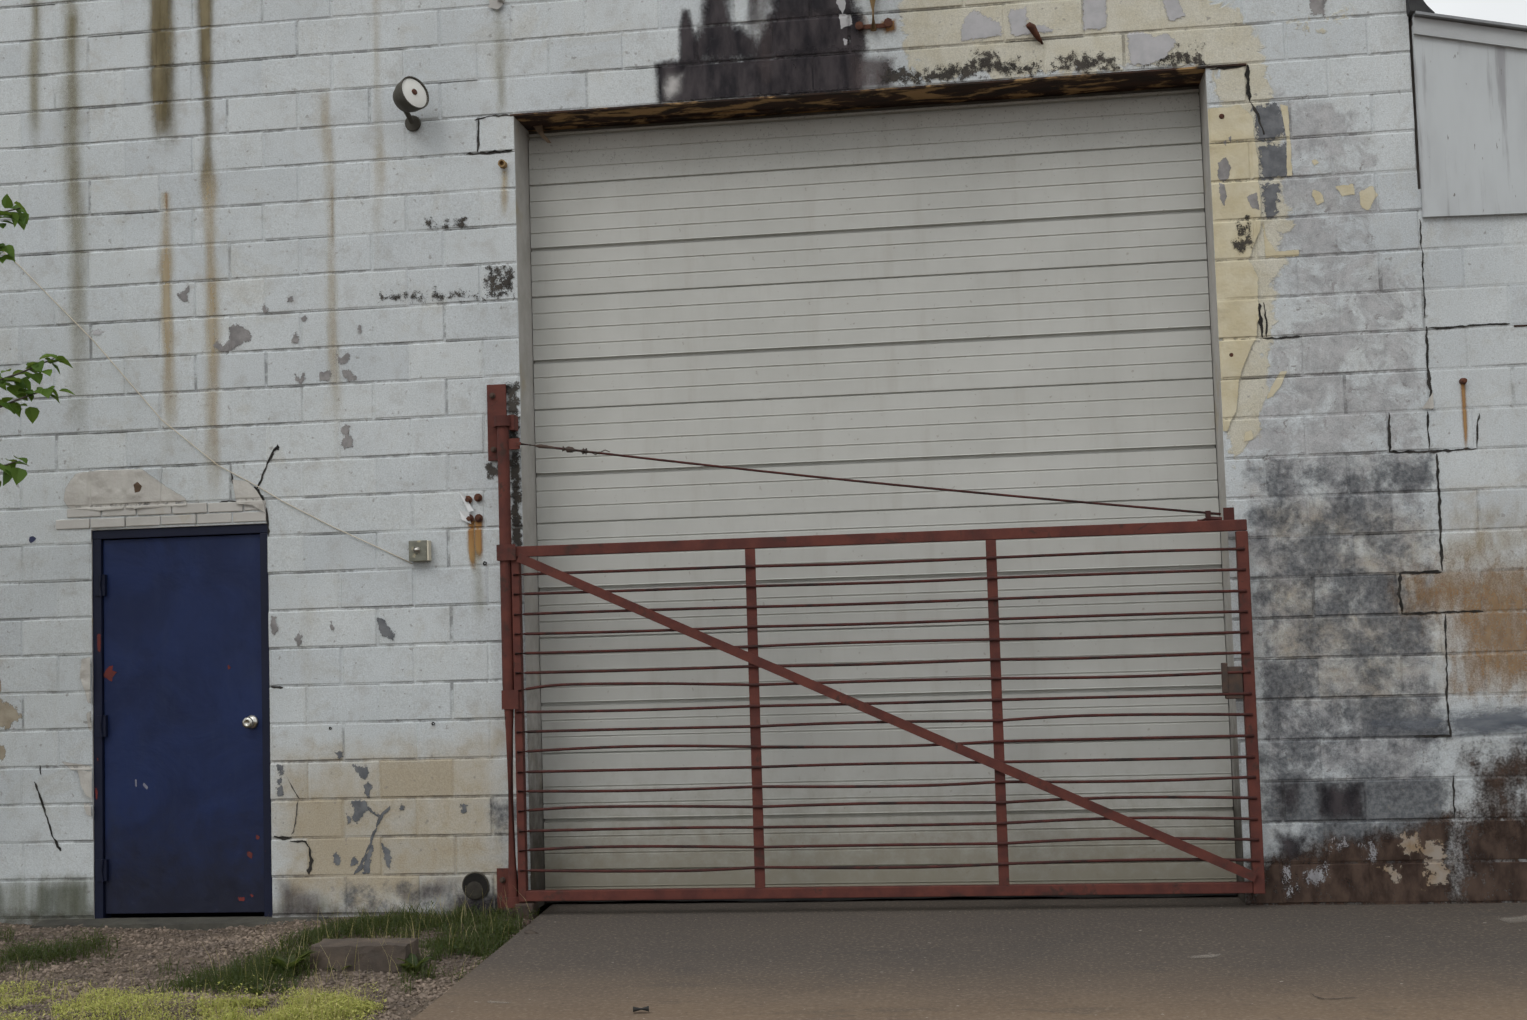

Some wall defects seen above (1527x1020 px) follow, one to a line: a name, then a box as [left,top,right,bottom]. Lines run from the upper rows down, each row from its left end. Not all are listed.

damp [150,0,172,129]
damp [198,0,212,194]
damp [655,0,1120,104]
damp [1141,40,1206,69]
peeling [1208,102,1299,442]
crack [1388,219,1510,738]
rust [468,520,482,566]
peeling [0,680,22,760]
damp [1371,709,1527,736]
peeling [335,751,380,825]
crack [1450,776,1458,820]
peeling [1282,831,1451,899]